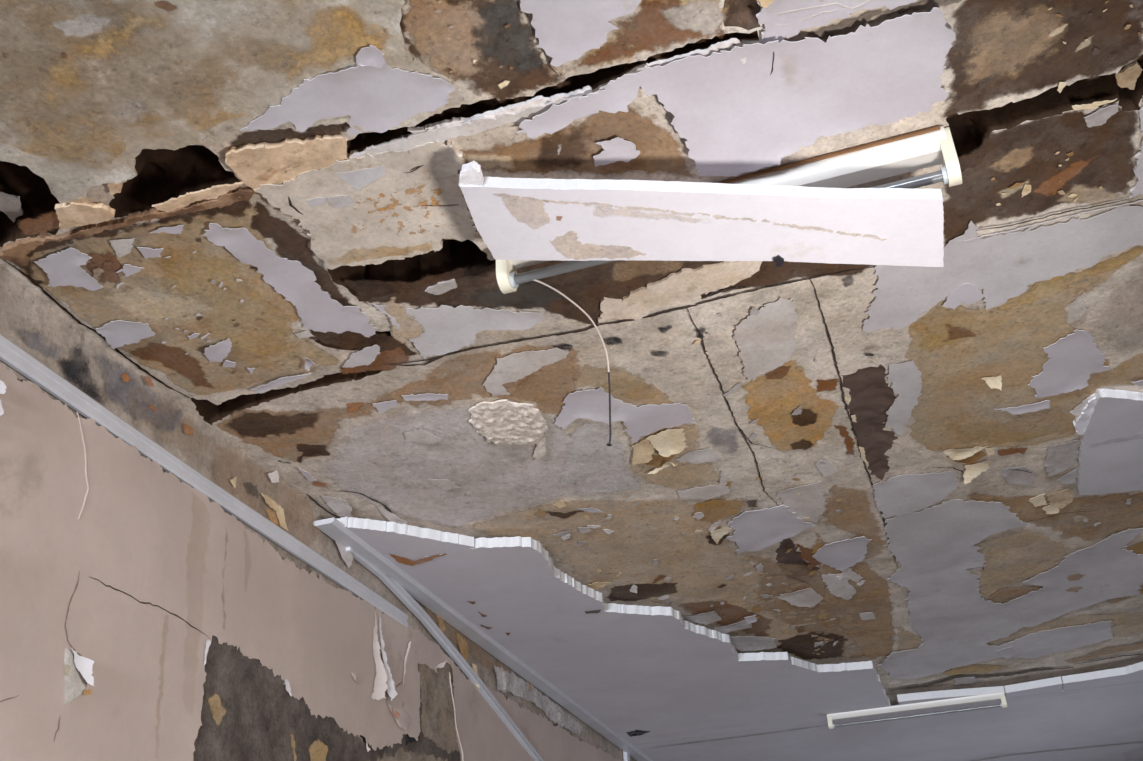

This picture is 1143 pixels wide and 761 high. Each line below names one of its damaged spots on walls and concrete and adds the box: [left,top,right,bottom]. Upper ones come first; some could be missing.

crack [288,197,303,215]
peeling [240,0,775,154]
crack [526,13,560,77]
peeling [593,137,640,167]
crack [763,0,871,75]
spalling [946,54,1143,162]
spalling [0,145,548,425]
crack [386,267,898,568]
crack [307,481,408,524]
peeling [554,360,1143,680]
crack [90,577,211,640]
spalling [193,635,461,761]